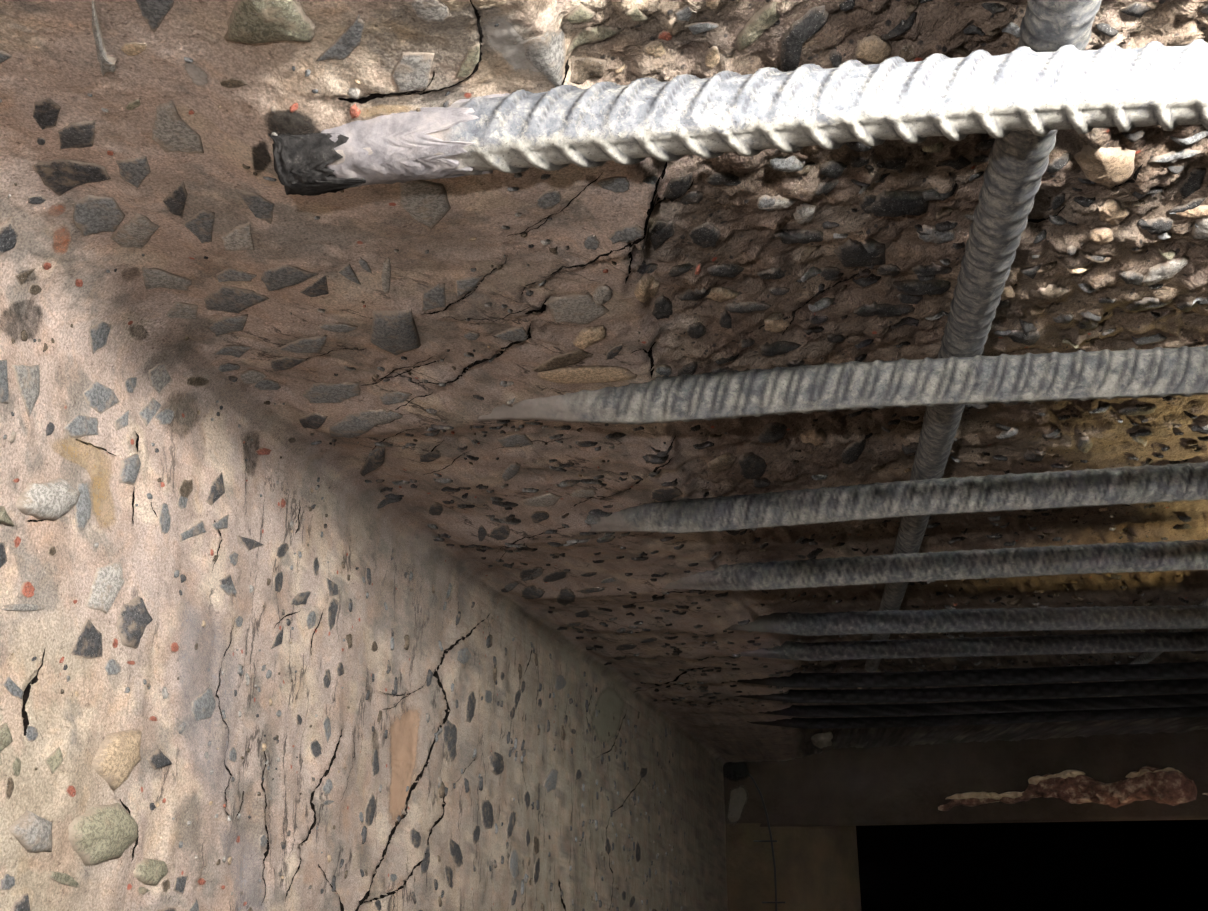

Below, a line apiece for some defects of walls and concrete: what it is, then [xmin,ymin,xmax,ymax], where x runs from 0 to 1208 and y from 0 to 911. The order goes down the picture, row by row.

crack [338,0,483,104]
crack [361,162,694,475]
crack [22,647,46,736]
crack [216,609,490,911]